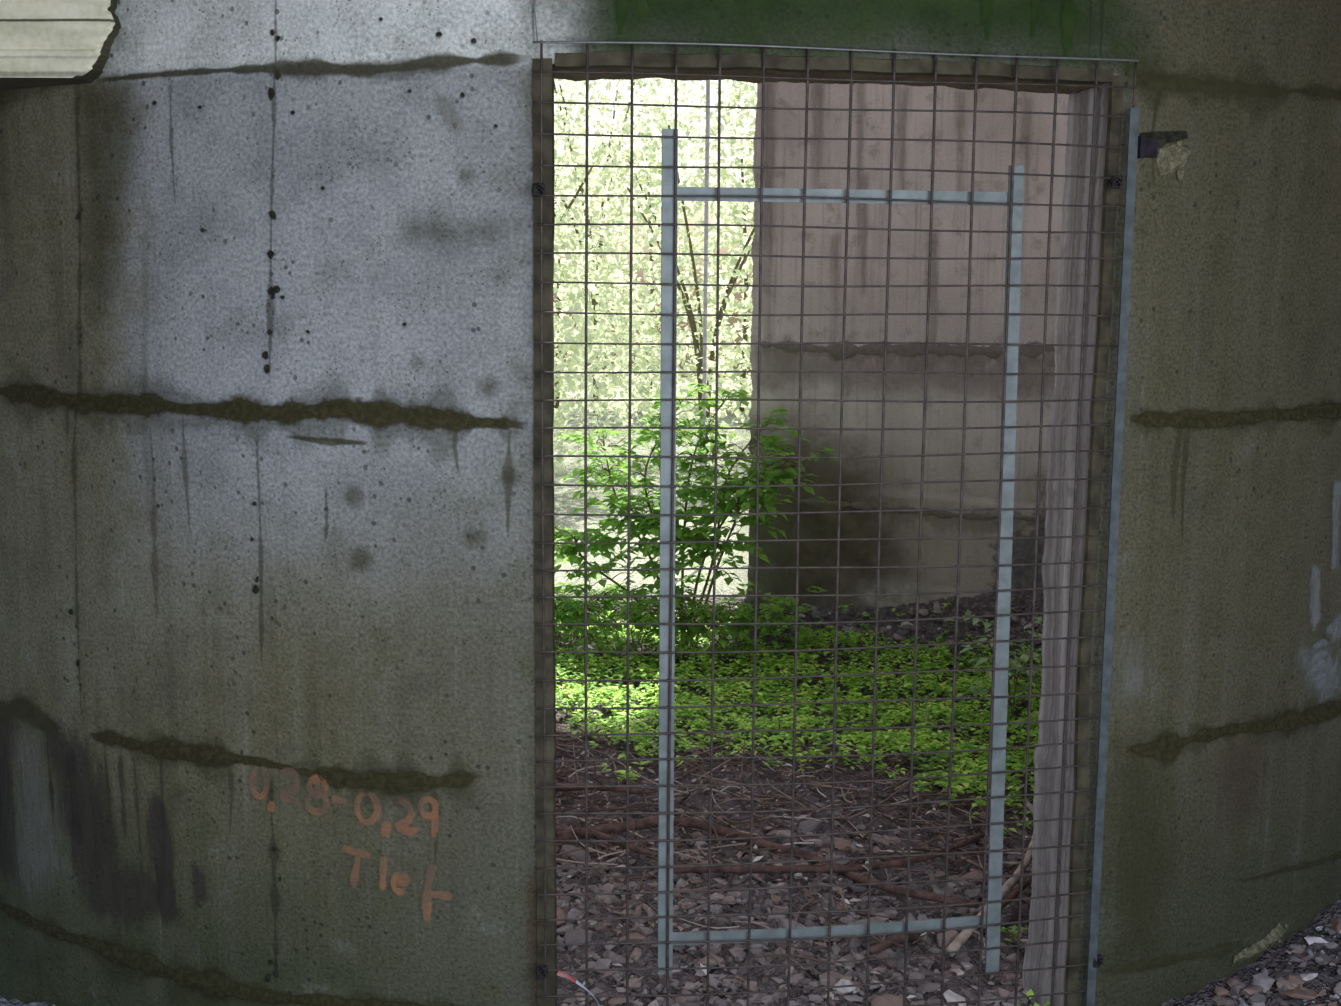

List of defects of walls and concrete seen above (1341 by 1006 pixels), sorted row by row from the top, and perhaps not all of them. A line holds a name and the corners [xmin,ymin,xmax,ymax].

leakage [47,728,175,924]